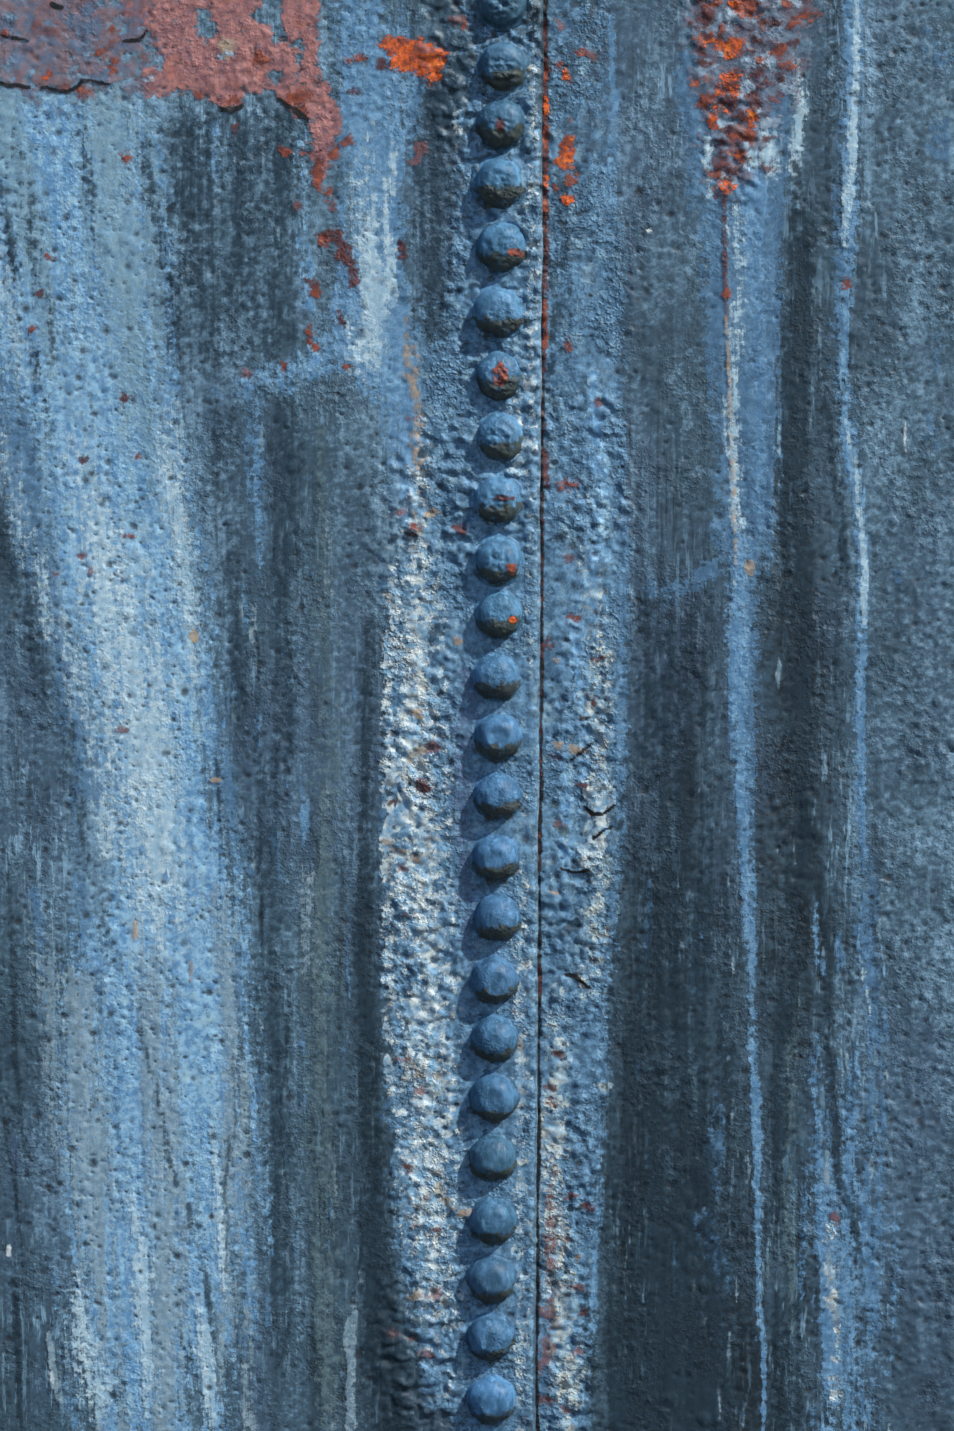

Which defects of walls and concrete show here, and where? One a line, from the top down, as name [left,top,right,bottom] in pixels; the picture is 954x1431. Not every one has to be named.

rust [0,0,159,100]
rust [343,34,449,84]
rust [408,142,428,165]
rust [542,20,595,385]
rust [678,0,824,438]
rust [541,403,579,498]
rust [537,626,554,871]